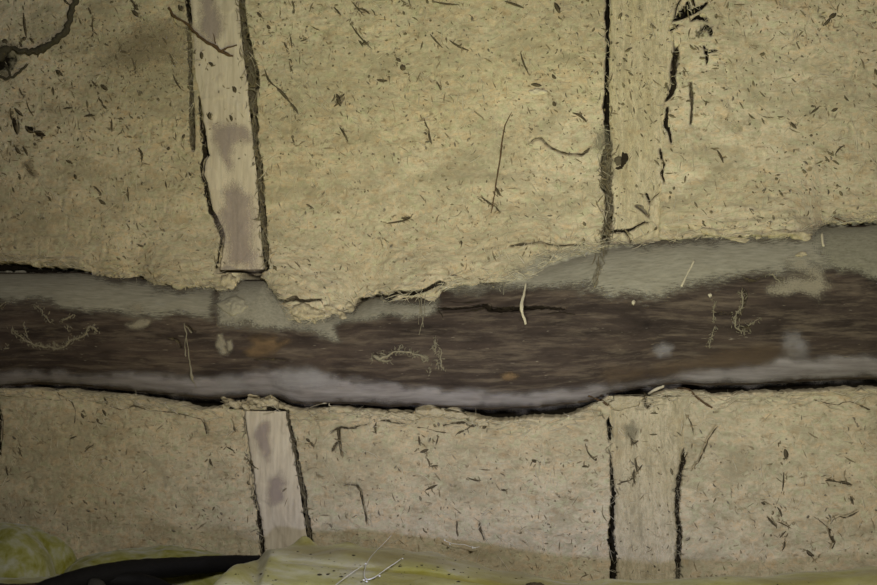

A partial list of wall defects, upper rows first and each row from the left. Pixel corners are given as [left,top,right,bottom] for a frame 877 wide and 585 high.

crack [184,0,192,24]
peeling [264,69,299,115]
peeling [4,88,46,176]
crack [511,0,718,290]
crack [198,97,226,268]
spalling [700,227,813,257]
spalling [277,293,355,324]
spalling [379,282,445,302]
spalling [608,394,645,411]
crack [598,412,620,579]
crack [671,426,718,579]